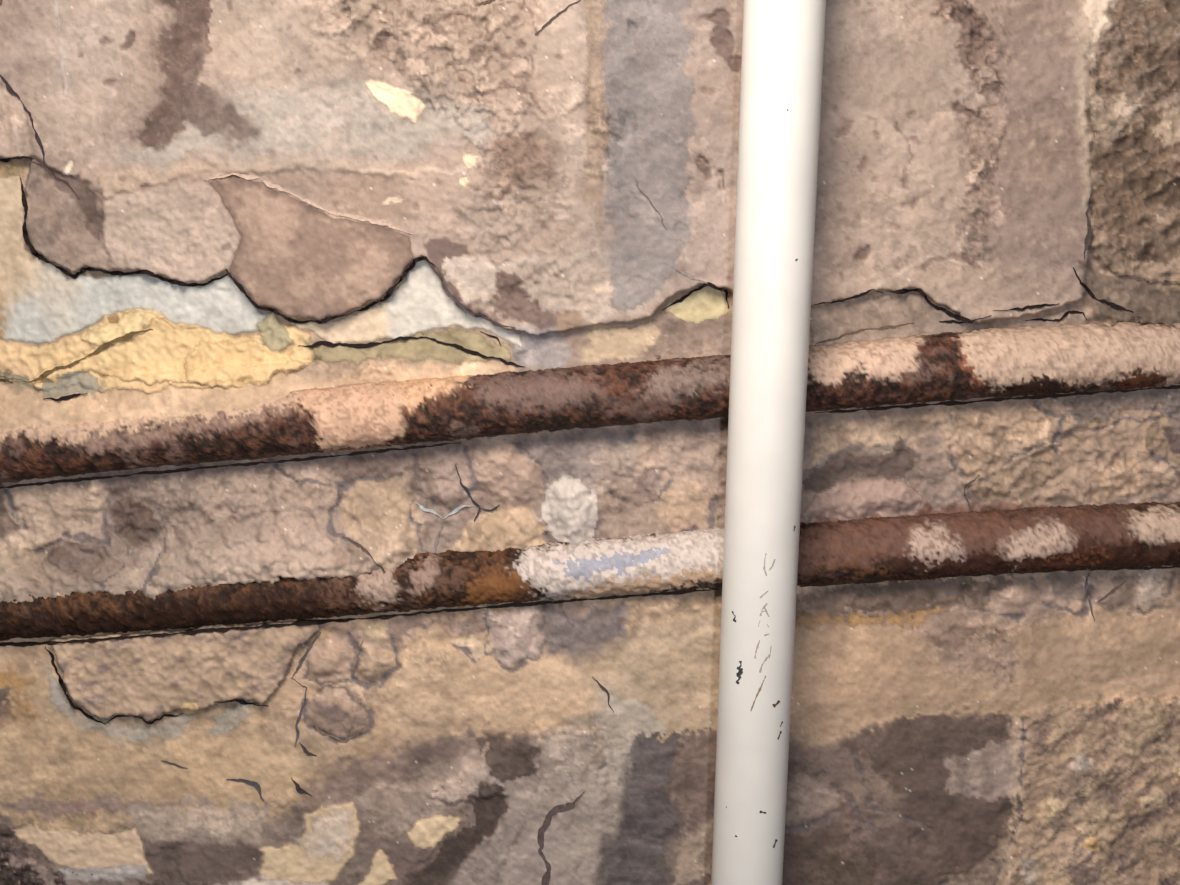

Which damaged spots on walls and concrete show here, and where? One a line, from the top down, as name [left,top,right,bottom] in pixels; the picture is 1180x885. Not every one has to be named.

crack [535,0,580,35]
leakage [125,0,492,166]
leakage [583,0,693,308]
crack [0,75,525,367]
spalling [0,173,522,398]
peeling [665,285,731,324]
corrosion [467,566,529,605]
corrosion [796,573,1013,627]
corrosion [799,503,1130,578]
crack [0,589,718,796]
crack [226,779,264,801]
crack [537,791,585,885]